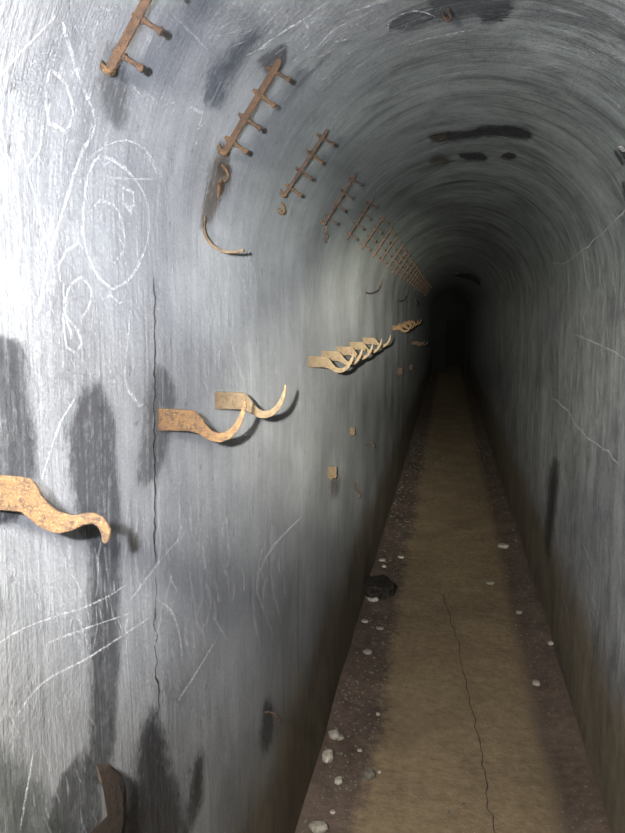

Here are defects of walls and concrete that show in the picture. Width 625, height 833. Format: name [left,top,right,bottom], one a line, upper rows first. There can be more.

leakage [389,0,512,30]
leakage [459,152,486,162]
leakage [428,125,532,145]
crack [550,209,625,265]
crack [574,334,625,359]
leakage [0,336,36,478]
leakage [0,510,20,524]
crack [152,278,160,718]
leakage [47,385,120,833]
crack [443,595,495,833]